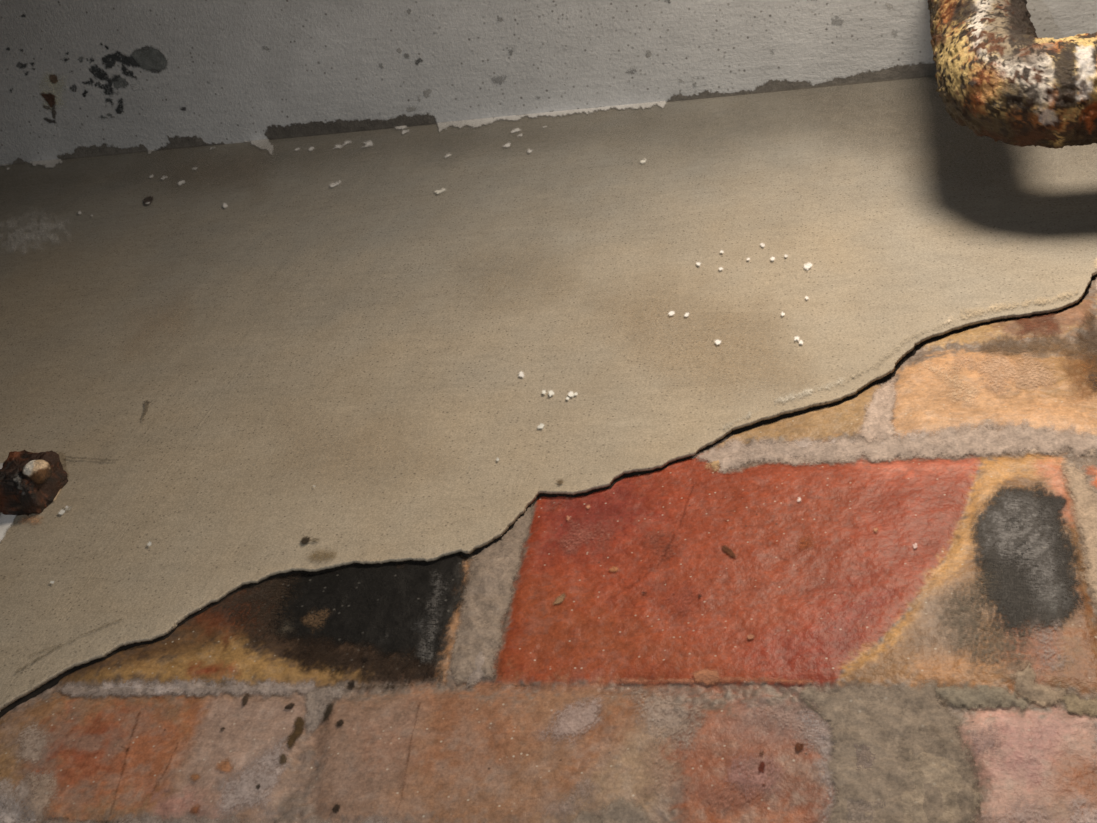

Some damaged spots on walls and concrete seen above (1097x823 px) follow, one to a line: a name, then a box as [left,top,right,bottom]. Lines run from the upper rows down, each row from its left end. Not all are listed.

spalling [301,537,333,560]
water stain [983,497,1066,611]
water stain [412,574,447,661]
spalling [617,669,812,685]